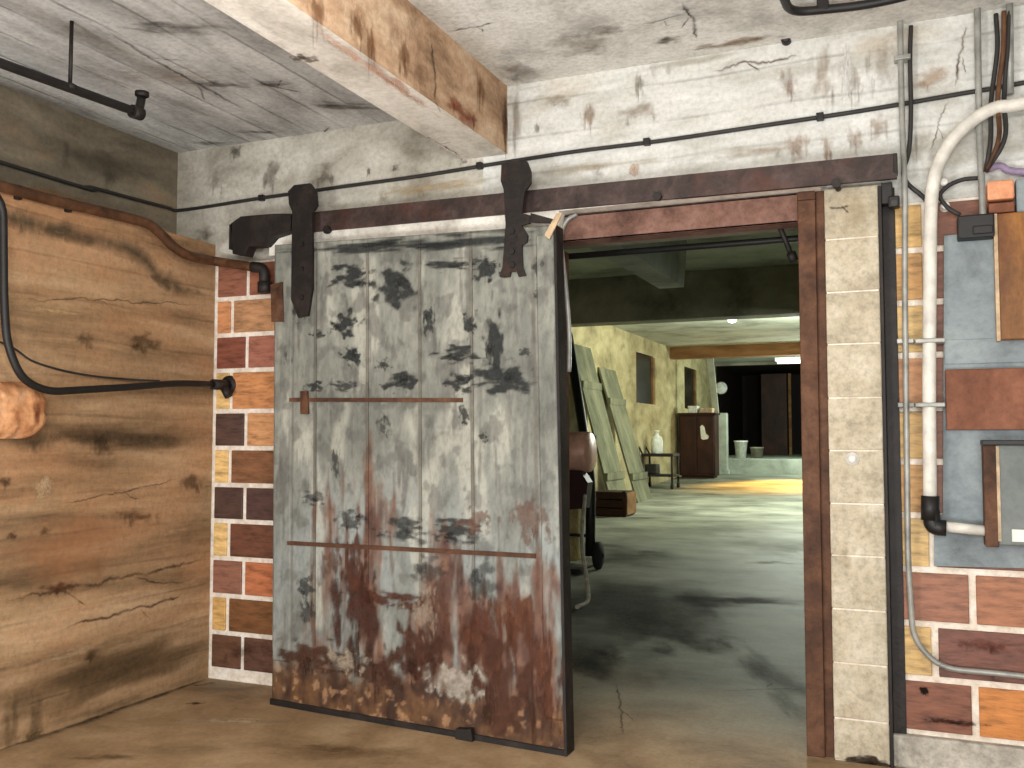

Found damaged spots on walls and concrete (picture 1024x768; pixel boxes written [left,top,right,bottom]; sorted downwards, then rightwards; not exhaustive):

crack [726,58,788,69]
crack [32,565,181,622]